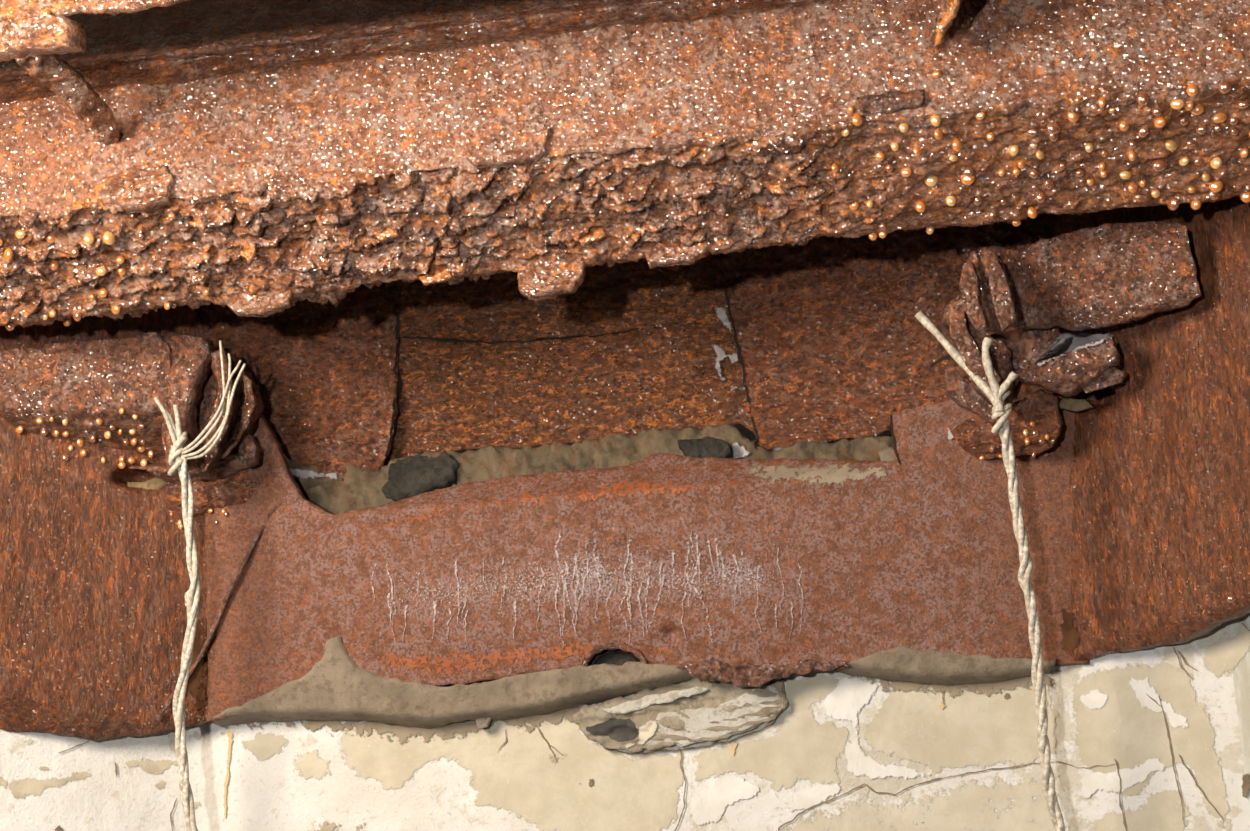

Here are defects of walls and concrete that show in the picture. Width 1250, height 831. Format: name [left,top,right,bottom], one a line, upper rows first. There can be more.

rust [934,0,960,46]
rust [417,243,460,286]
rust [518,227,606,300]
rust [644,240,710,269]
rust [220,289,295,318]
crack [724,290,759,450]
spalling [677,436,732,458]
spalling [382,452,459,502]
damp [371,524,804,649]
peeling [241,615,1250,831]
peeling [0,766,91,799]
crack [778,759,1127,831]